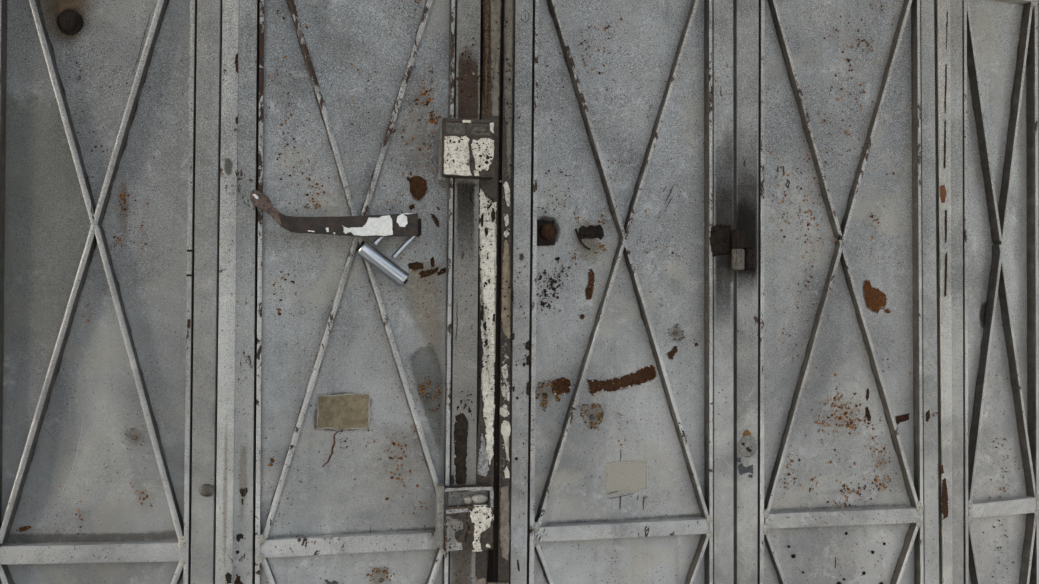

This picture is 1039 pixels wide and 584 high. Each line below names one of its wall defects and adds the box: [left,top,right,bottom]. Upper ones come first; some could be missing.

corrosion [264,2,334,216]
corrosion [449,0,502,119]
corrosion [579,0,667,130]
corrosion [335,31,447,360]
corrosion [765,0,907,373]
corrosion [266,232,330,320]
peeling [450,0,530,572]
corrosion [566,237,612,300]
corrosion [286,423,432,529]
corrosion [516,375,575,412]
corrosion [577,364,672,455]
corrosion [778,367,910,510]